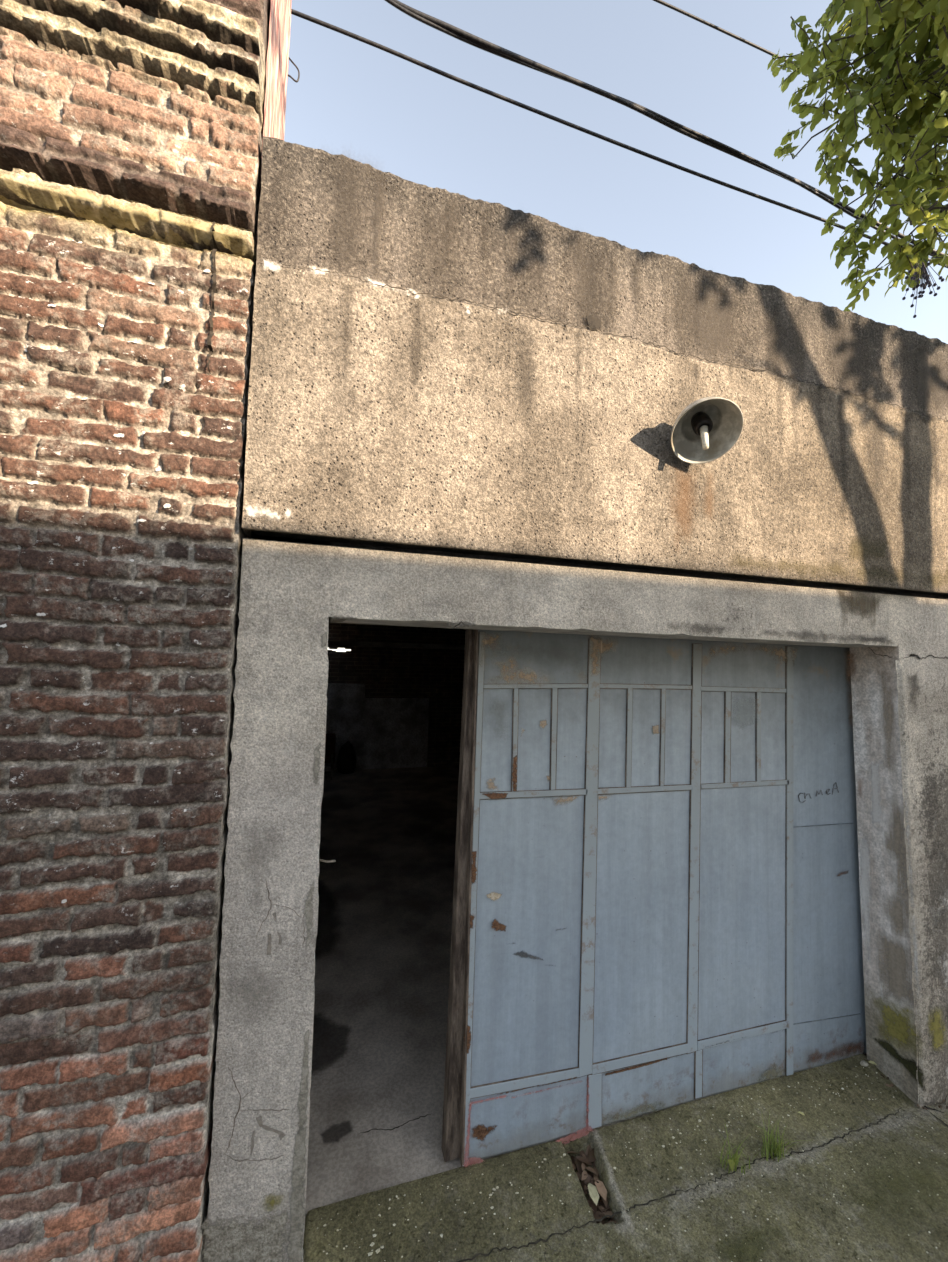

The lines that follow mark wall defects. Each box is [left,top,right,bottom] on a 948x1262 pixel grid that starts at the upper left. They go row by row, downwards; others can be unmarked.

crack [207,222,220,374]
water stain [679,281,732,353]
water stain [835,331,868,385]
water stain [907,347,948,406]
water stain [910,675,919,704]
rust [483,755,517,799]
water stain [861,842,869,934]
rust [605,1058,669,1076]
crack [359,1114,431,1134]
rust [473,1125,496,1141]
crack [457,1094,948,1262]